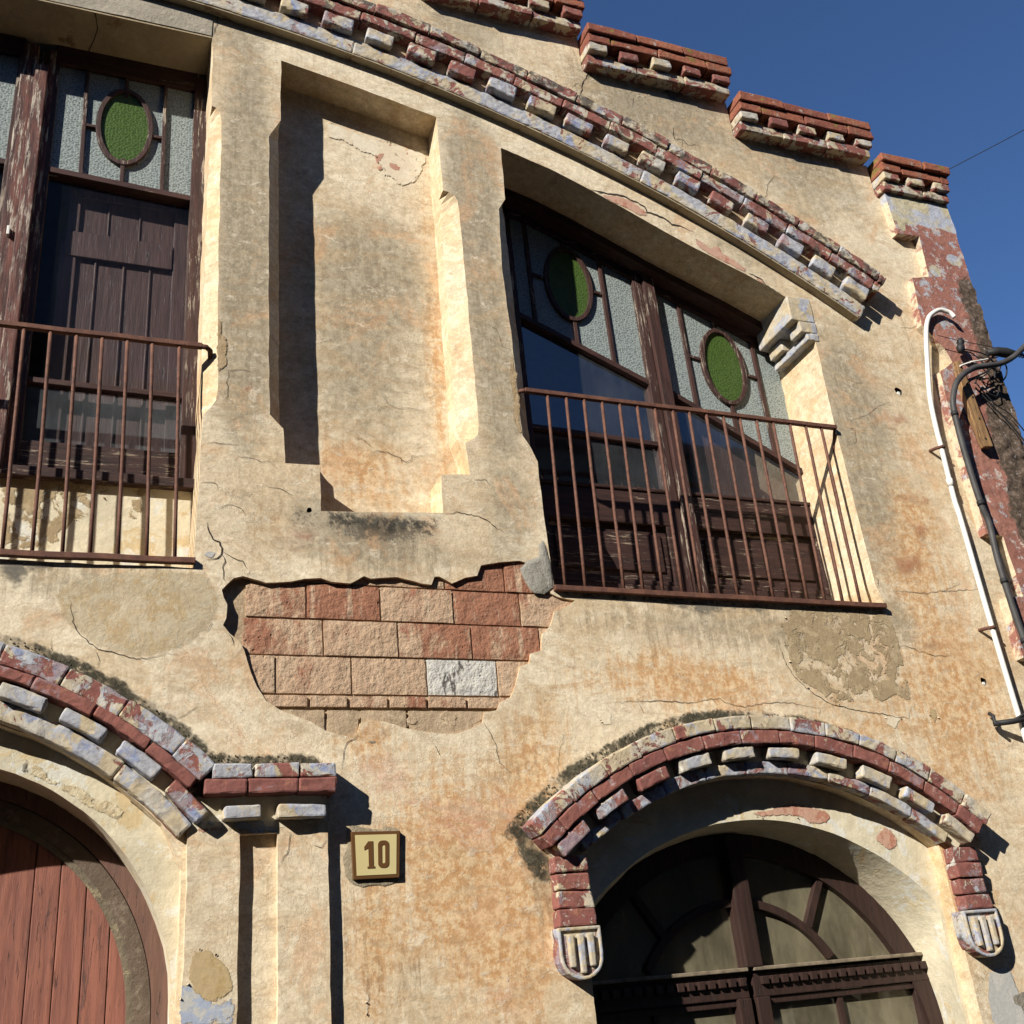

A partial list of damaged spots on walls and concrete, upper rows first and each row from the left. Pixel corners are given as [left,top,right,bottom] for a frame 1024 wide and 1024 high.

crack [591,189,692,231]
crack [202,482,247,581]
damp [329,513,433,532]
crack [70,606,170,664]
spalling [222,562,573,737]
crack [615,646,914,719]
peeling [780,605,910,704]
peeling [754,804,830,823]
peeling [876,827,897,849]
peeling [178,948,234,1024]